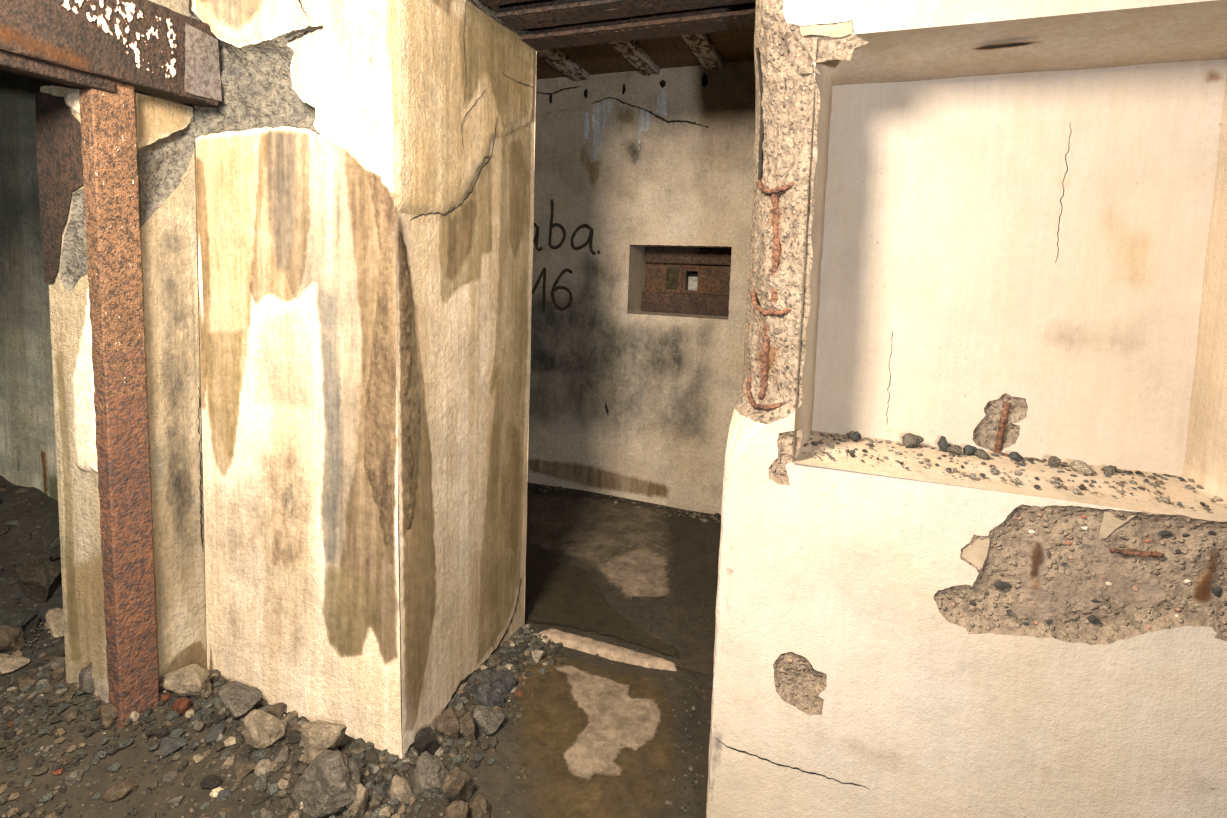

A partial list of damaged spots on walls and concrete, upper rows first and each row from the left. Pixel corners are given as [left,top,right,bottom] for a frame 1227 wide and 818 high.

peeling [62,0,177,78]
flaking render [64,91,80,114]
flaking render [137,0,535,229]
crack [410,1,709,221]
leakage [583,100,612,160]
leakage [630,88,667,159]
flaking render [60,188,98,473]
spalling [706,0,869,818]
spalling [972,393,1028,457]
leakage [648,484,666,495]
spalling [933,504,1227,645]
crack [715,738,869,789]